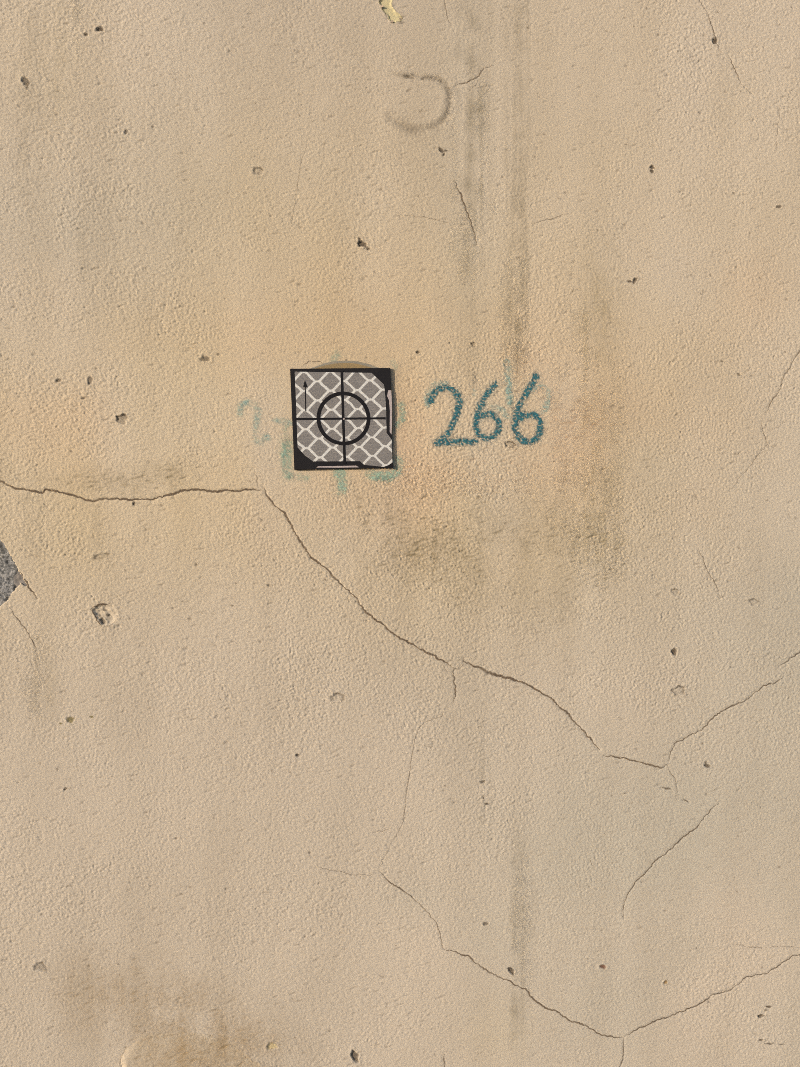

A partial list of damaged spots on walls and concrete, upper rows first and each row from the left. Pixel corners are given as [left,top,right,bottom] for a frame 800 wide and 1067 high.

peeling [379,0,402,23]
spalling [0,539,27,606]
crack [0,481,800,909]
crack [437,926,800,1067]